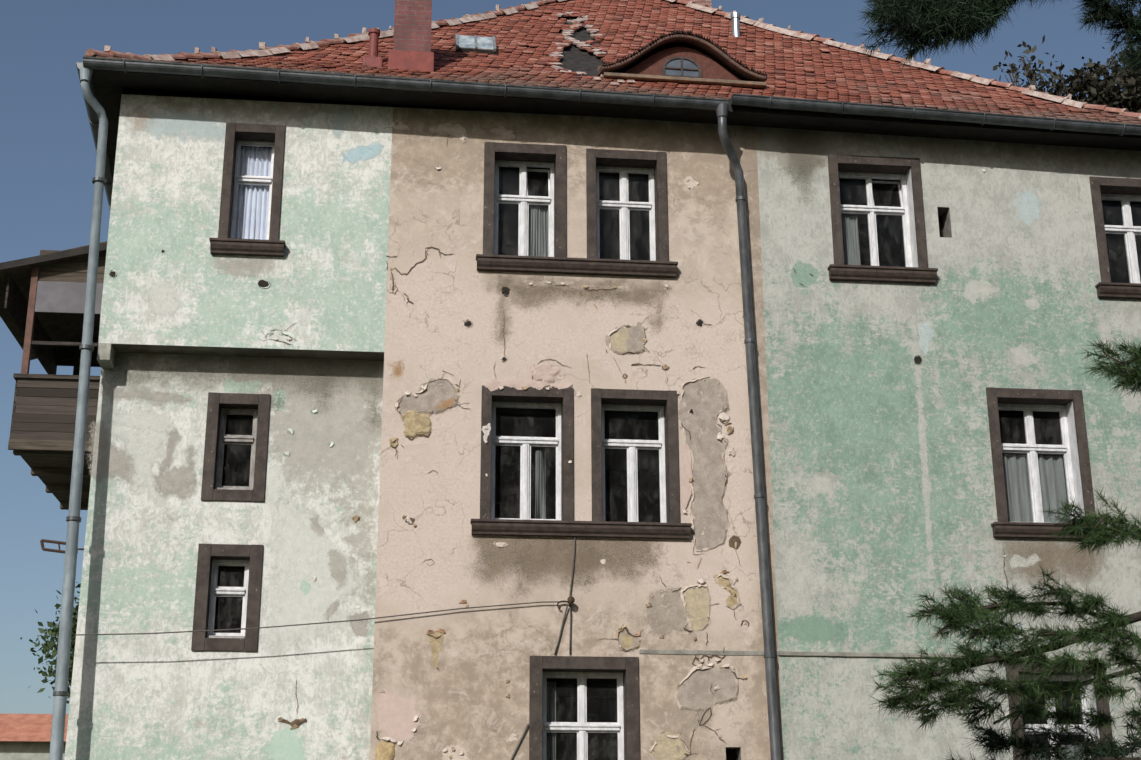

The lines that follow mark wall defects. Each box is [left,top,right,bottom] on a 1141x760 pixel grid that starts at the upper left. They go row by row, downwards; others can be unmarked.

crack [388,246,451,304]
spalling [605,317,649,355]
spalling [382,370,470,458]
peeling [677,376,741,555]
leakage [463,536,668,602]
leakage [993,538,1108,591]
spalling [603,569,747,760]